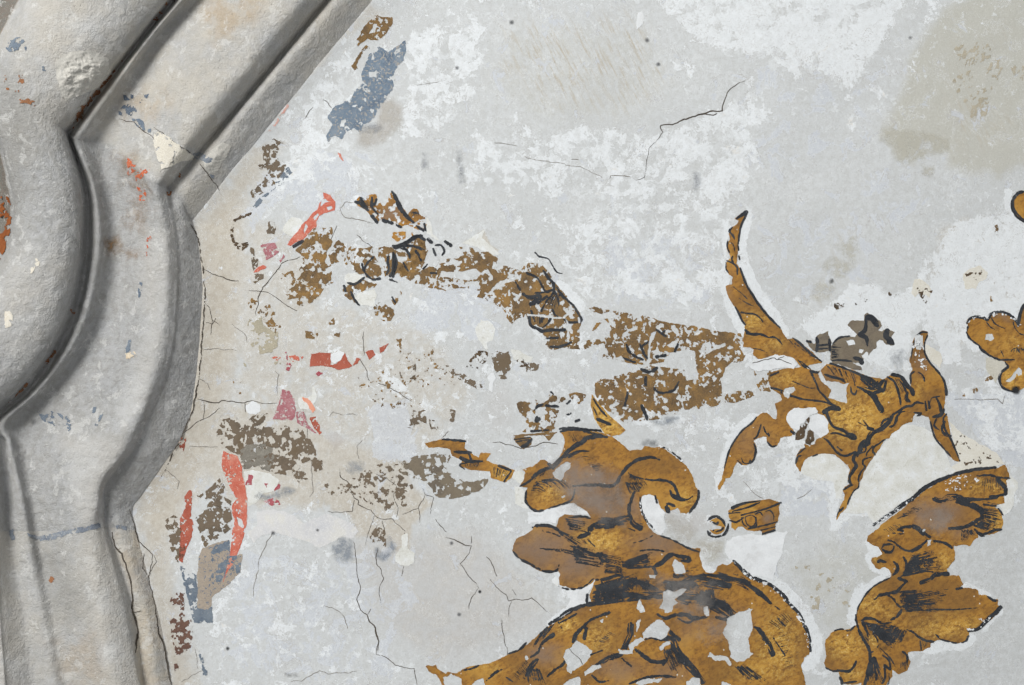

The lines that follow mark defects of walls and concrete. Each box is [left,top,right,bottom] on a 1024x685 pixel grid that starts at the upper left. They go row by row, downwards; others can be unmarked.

peeling [351,15,393,70]
crack [503,81,744,180]
peeling [230,212,264,283]
crack [204,257,299,351]
crack [185,371,279,447]
peeling [358,339,539,429]
peeling [165,515,189,575]
peeling [196,478,232,547]
peeling [216,412,323,491]
peeling [324,453,488,511]
crack [303,410,546,683]
crack [112,509,200,683]